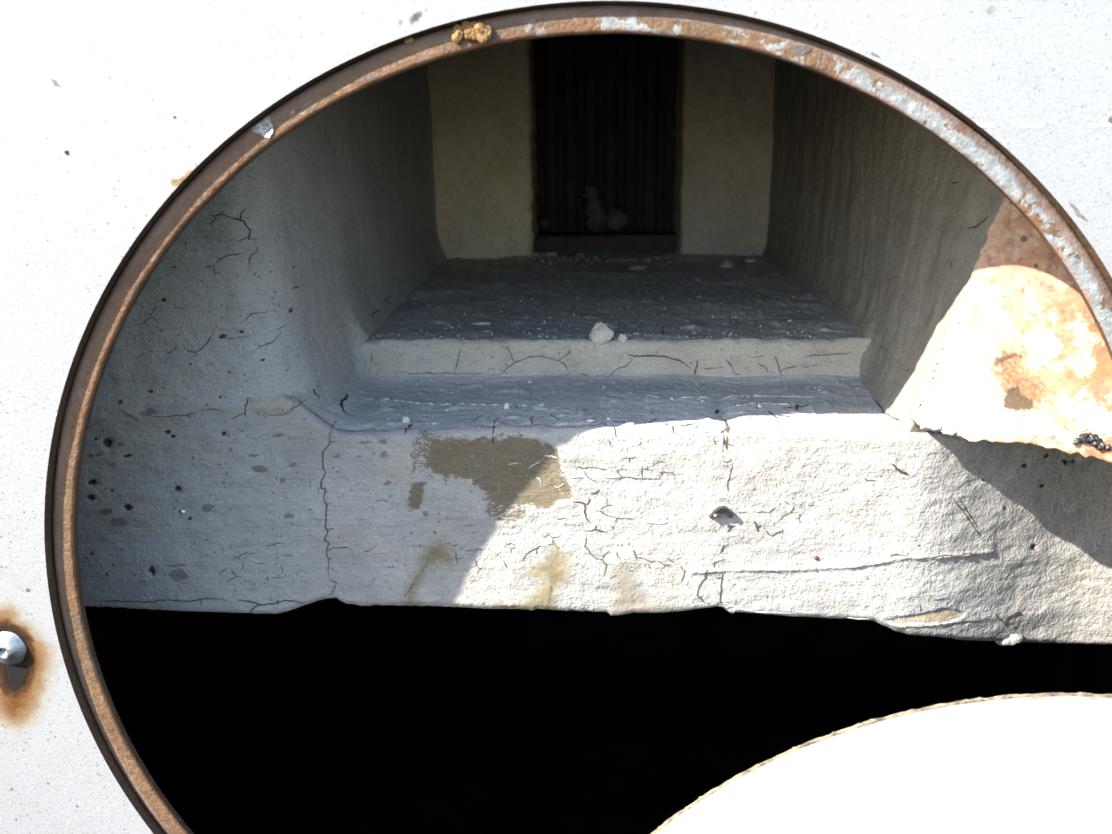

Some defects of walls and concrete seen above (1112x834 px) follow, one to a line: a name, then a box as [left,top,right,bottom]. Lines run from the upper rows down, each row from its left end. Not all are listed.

crack [135,209,297,360]
crack [403,326,851,376]
corrosion [990,339,1057,411]
crack [151,389,375,594]
crack [452,404,812,605]
crack [100,543,304,612]
damp [407,546,450,605]
damp [515,551,566,608]
corrosion [0,608,49,725]